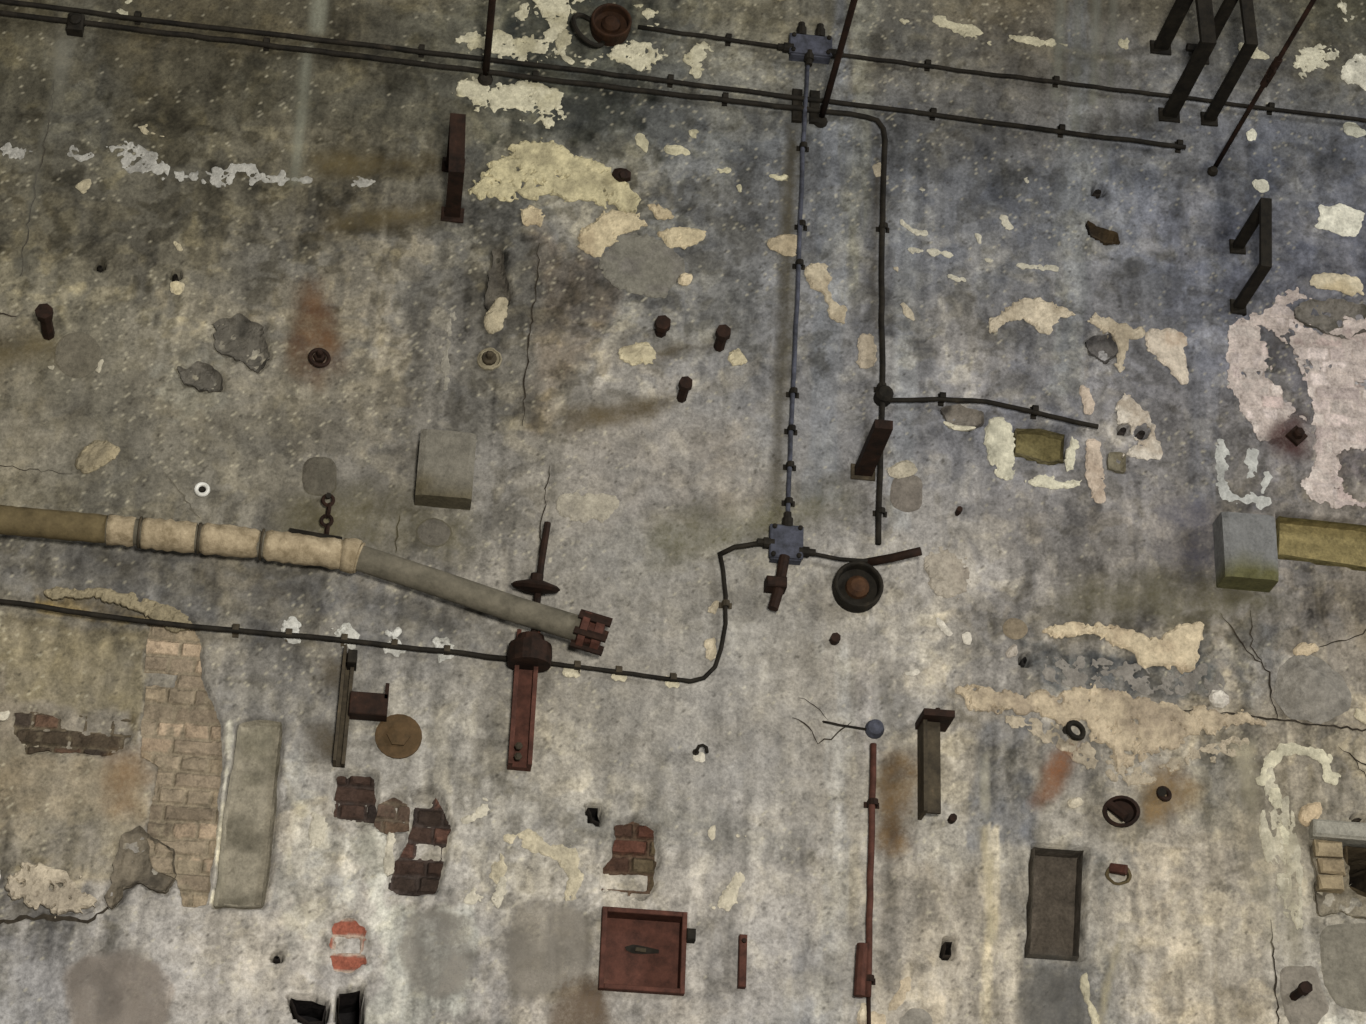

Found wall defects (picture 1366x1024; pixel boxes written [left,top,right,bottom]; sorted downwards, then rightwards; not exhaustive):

peeling [1337,1,1355,22]
peeling [455,0,714,79]
peeling [1293,43,1366,91]
peeling [456,76,567,139]
peeling [1343,122,1366,138]
peeling [520,205,545,227]
peeling [647,204,706,250]
peeling [1085,312,1145,373]
flaking render [1225,287,1366,509]
peeling [1042,656,1114,690]
flaking render [0,625,222,912]
peeling [383,832,396,877]